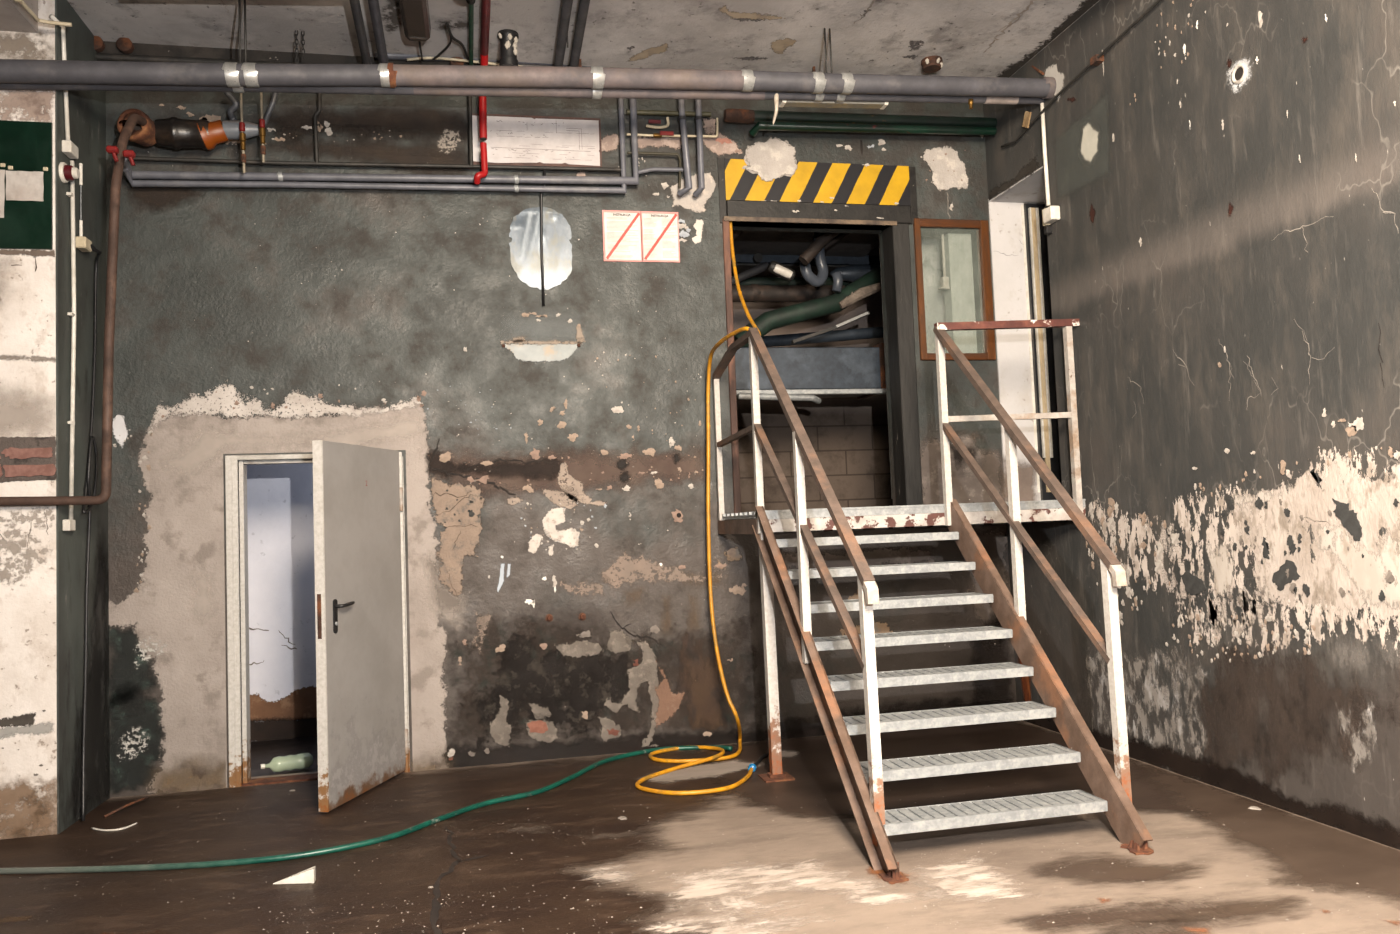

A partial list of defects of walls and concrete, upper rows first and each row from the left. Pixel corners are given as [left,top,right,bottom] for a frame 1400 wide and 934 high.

spalling [1227,59,1250,93]
crack [1273,216,1327,251]
water stain [920,433,1035,505]
flaking render [108,379,704,794]
peeling [542,547,747,599]
water stain [974,529,1010,590]
peeling [1085,408,1400,674]
flaking render [840,621,893,636]
water stain [0,539,1026,934]
water stain [849,718,1095,810]
water stain [1014,648,1400,934]